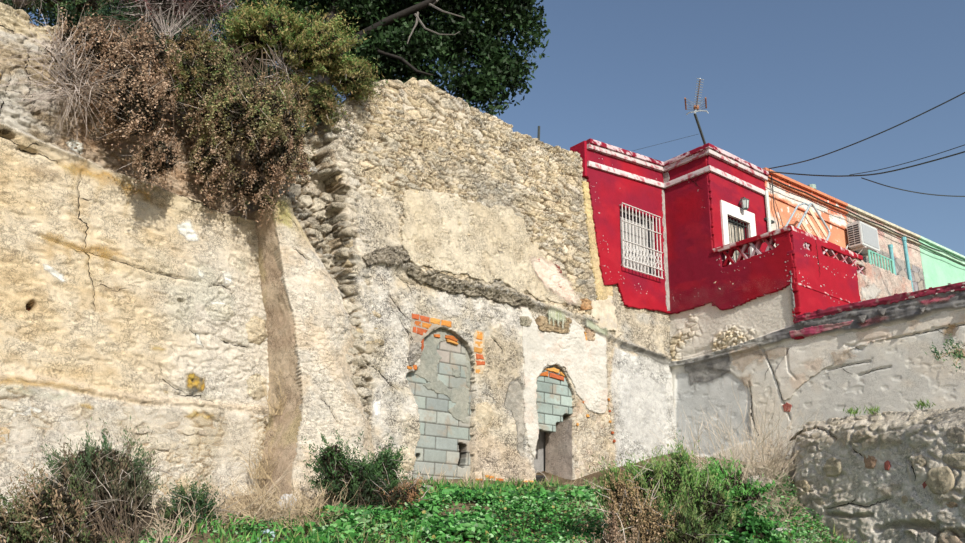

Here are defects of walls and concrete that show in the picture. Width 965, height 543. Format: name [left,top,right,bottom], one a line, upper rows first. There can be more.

crack [0,25,36,114]
crack [9,139,59,165]
crack [38,151,238,309]
flaking render [362,181,668,458]
crack [750,359,789,438]